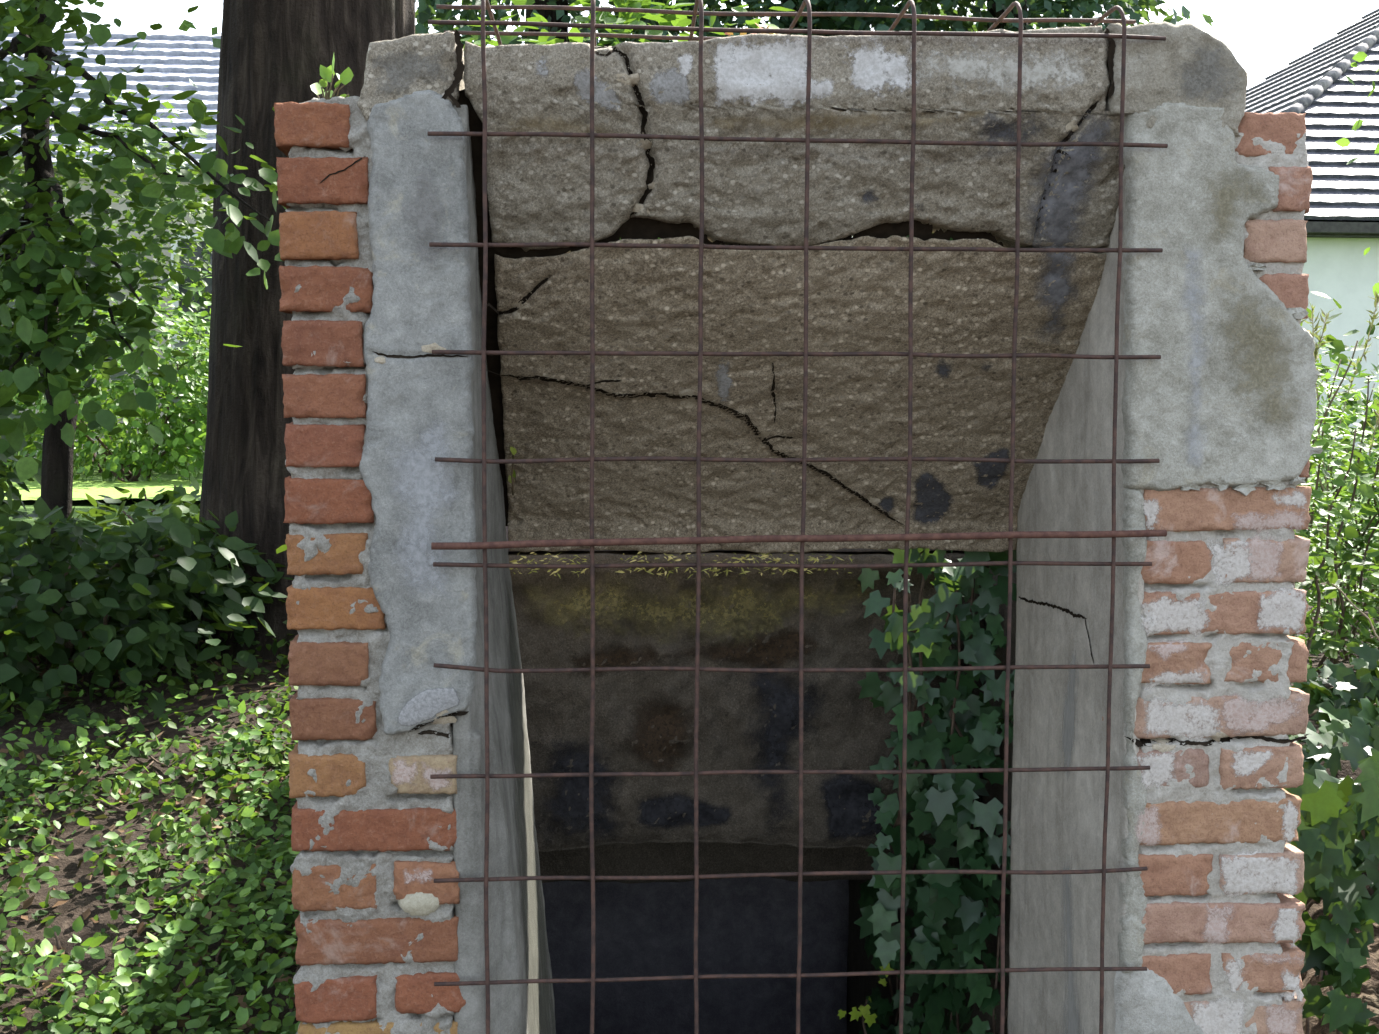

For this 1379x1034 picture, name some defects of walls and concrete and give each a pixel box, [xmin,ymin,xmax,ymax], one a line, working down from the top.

crack [821,28,1116,247]
crack [372,29,905,526]
peeling [1180,475,1307,633]
water stain [542,742,615,840]
water stain [639,794,730,828]
water stain [576,628,818,818]
water stain [821,774,884,839]
crack [1019,596,1094,664]
peeling [1133,753,1175,789]
peeling [1141,596,1302,741]
peeling [1233,751,1273,775]
peeling [1204,801,1304,1034]